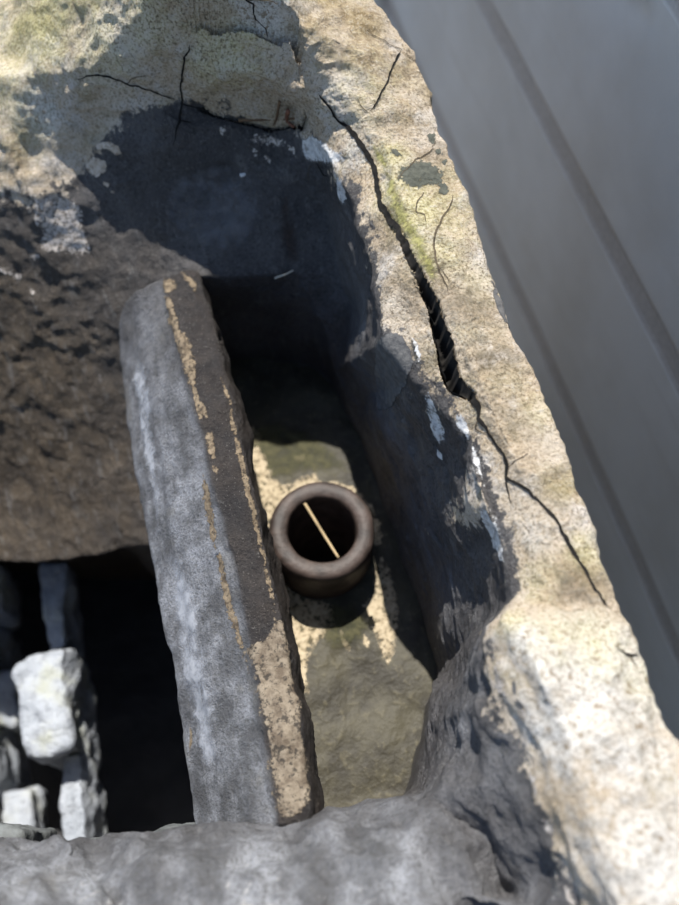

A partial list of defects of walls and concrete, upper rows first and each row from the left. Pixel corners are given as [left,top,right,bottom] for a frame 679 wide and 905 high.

crack [245,0,277,37]
crack [78,45,193,145]
peeling [82,141,122,193]
peeling [251,134,296,163]
peeling [30,194,90,260]
crack [319,30,610,608]